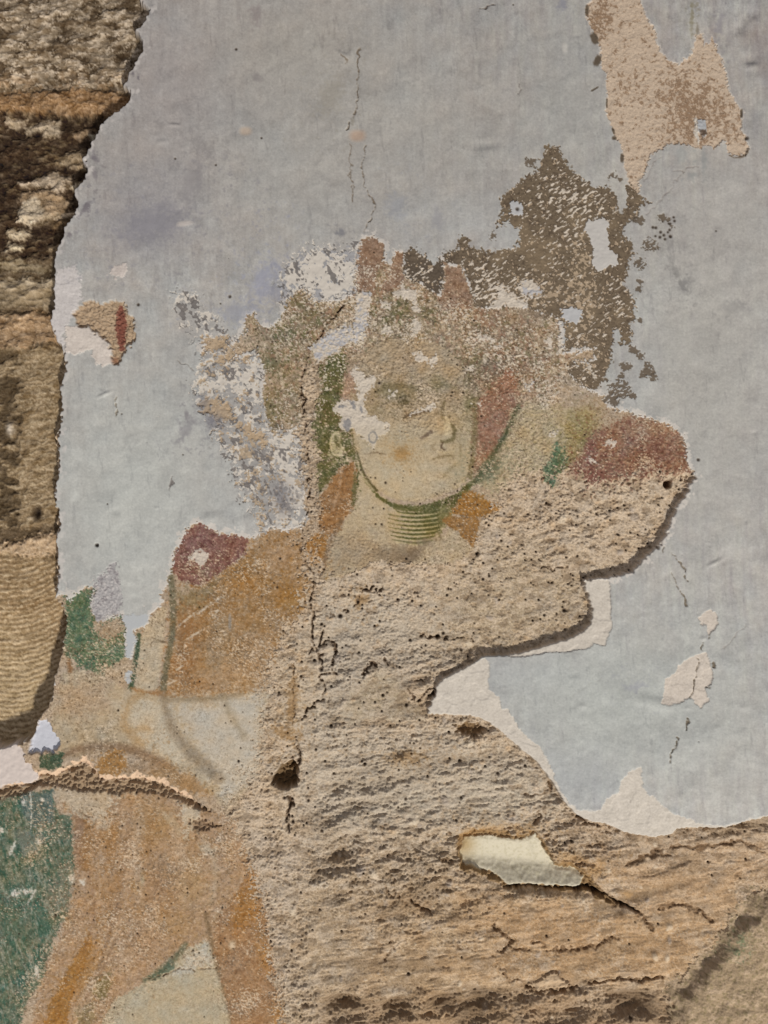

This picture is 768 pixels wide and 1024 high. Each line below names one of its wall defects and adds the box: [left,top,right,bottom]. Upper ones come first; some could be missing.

peeling [64,300,136,368]
spalling [170,0,768,1024]
peeling [90,562,123,624]
crack [292,585,386,718]
crack [420,633,474,642]
crack [411,679,437,702]
crack [0,756,207,817]
crack [285,795,295,831]
crack [524,781,553,836]
crack [505,815,714,931]
crack [625,839,760,867]
crack [492,923,659,996]